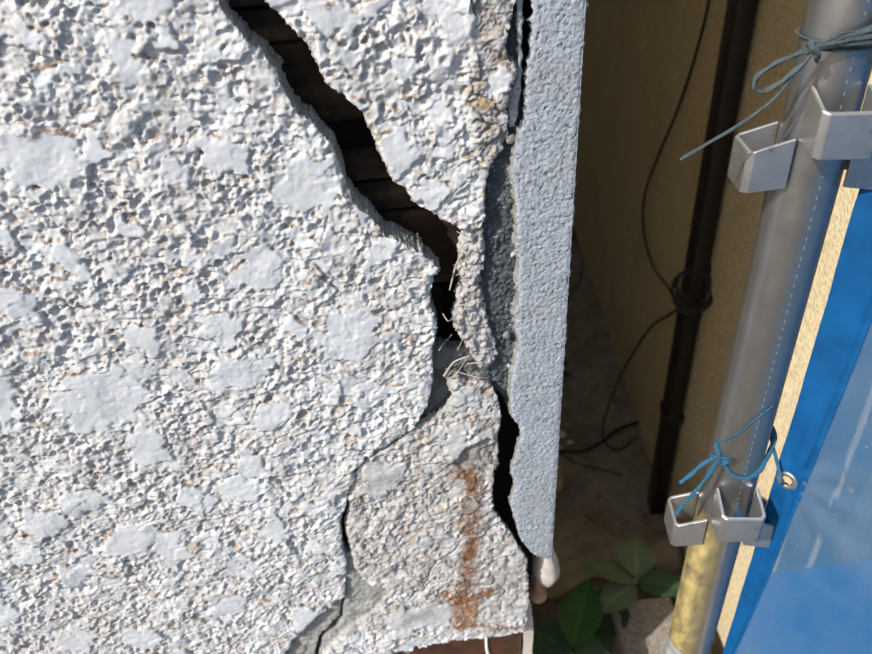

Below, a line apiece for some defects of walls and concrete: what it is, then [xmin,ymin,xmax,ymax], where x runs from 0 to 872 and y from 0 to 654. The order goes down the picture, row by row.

spalling [420,0,525,417]
crack [218,0,534,654]
rust [456,470,484,499]
spalling [453,438,497,470]
spalling [288,553,388,654]
rust [441,514,523,630]